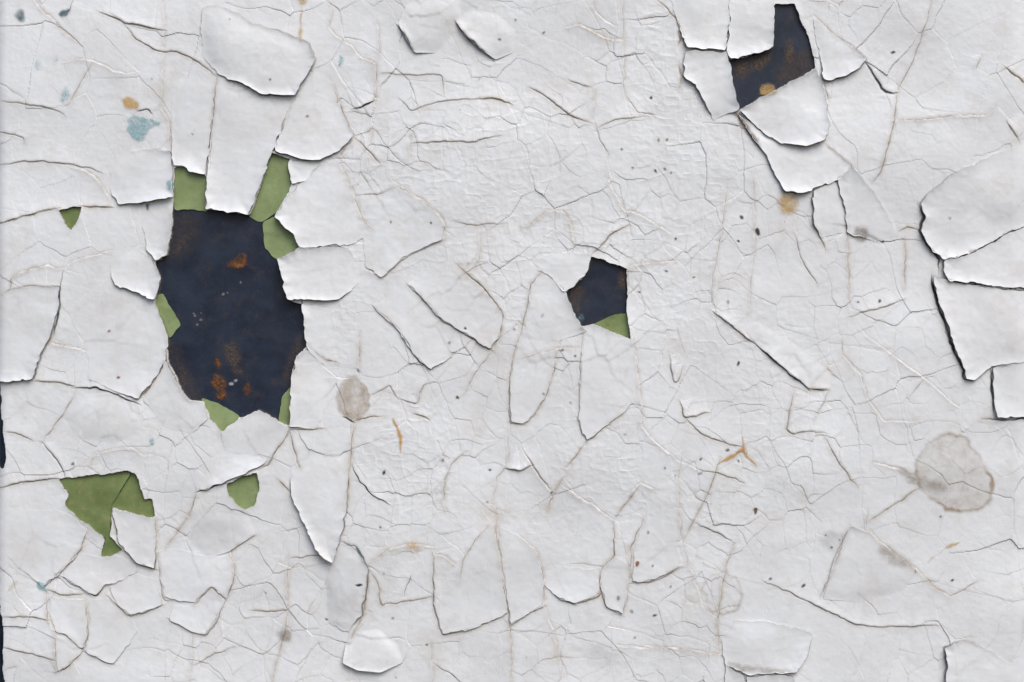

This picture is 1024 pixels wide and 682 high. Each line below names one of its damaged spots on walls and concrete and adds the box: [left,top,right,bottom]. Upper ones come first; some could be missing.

peeling [670,0,899,241]
peeling [60,207,82,230]
corrosion [212,347,240,399]
peeling [87,5,443,509]
peeling [374,267,502,369]
peeling [510,251,638,439]
crack [760,348,804,384]
crack [918,213,1024,421]
peeling [921,146,1024,418]
peeling [4,470,233,671]
crack [344,542,366,586]